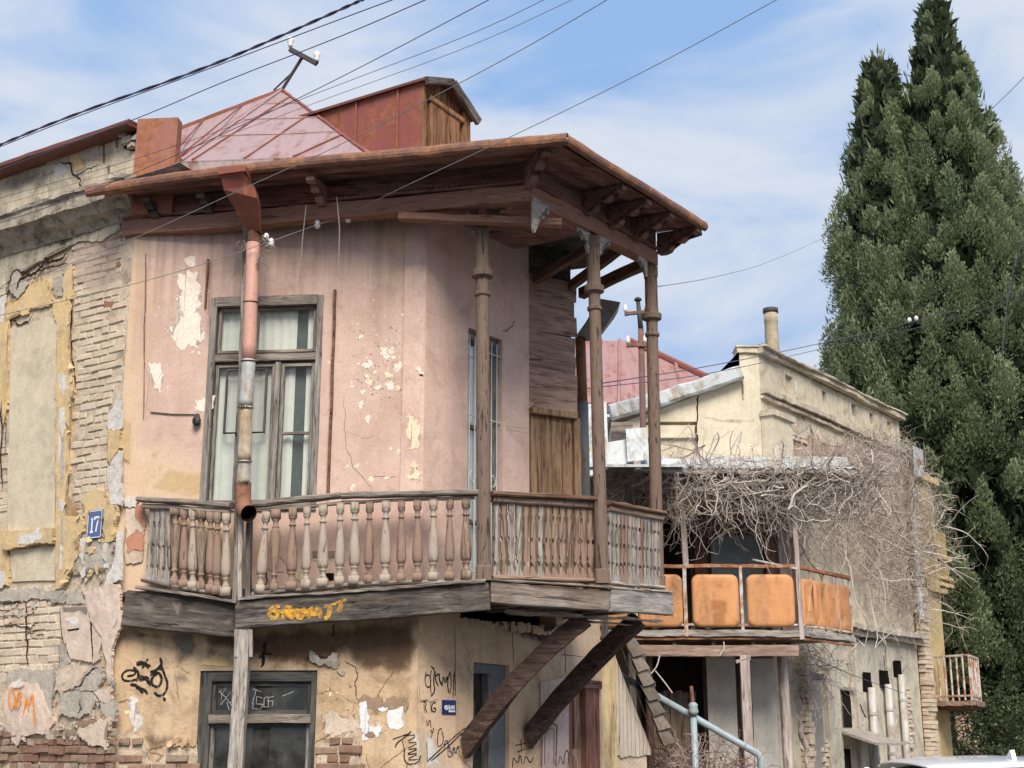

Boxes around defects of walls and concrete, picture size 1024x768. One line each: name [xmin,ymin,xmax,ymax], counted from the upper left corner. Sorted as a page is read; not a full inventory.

crack [60,161,97,186]
crack [8,252,76,384]
flaking render [0,225,200,768]
peeling [148,256,216,428]
crack [343,405,385,486]
peeling [344,308,424,485]
flaking render [315,685,409,768]